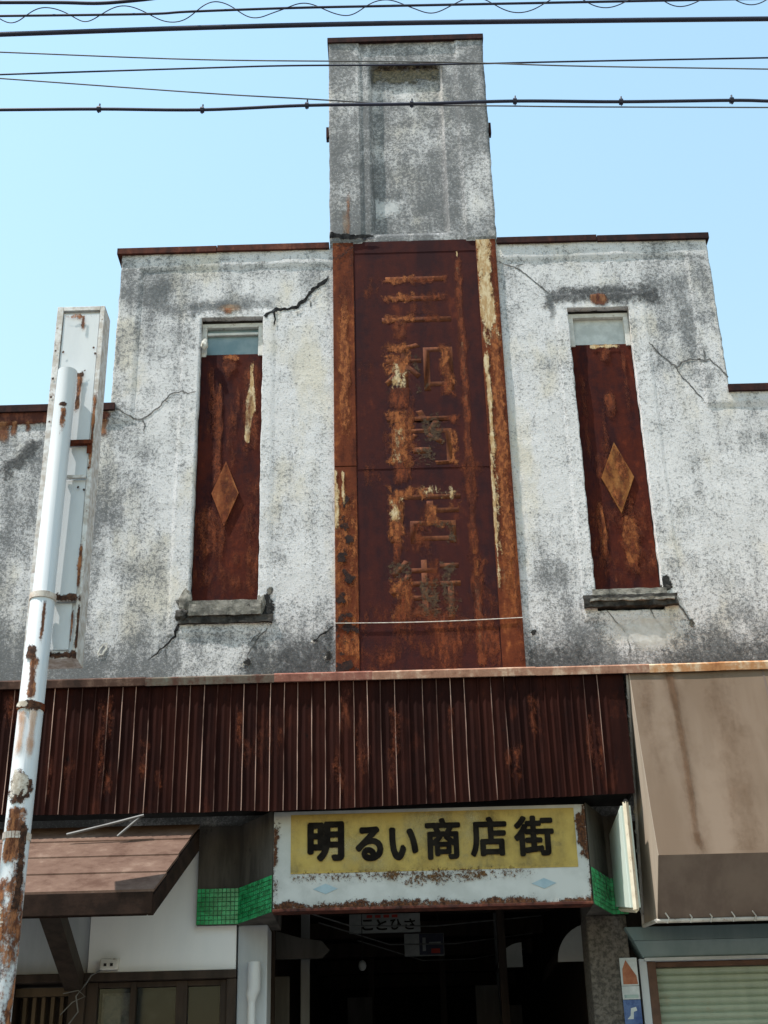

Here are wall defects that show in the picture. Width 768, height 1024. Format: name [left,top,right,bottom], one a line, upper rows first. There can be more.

crack [263,276,329,325]
rust [590,344,627,385]
crack [649,342,728,399]
rust [0,412,47,441]
rust [59,401,67,434]
rust [101,411,110,435]
crack [115,390,196,431]
rust [193,355,259,591]
rust [594,394,657,573]
crack [147,624,179,661]
rust [14,602,46,752]
rust [0,769,34,1024]